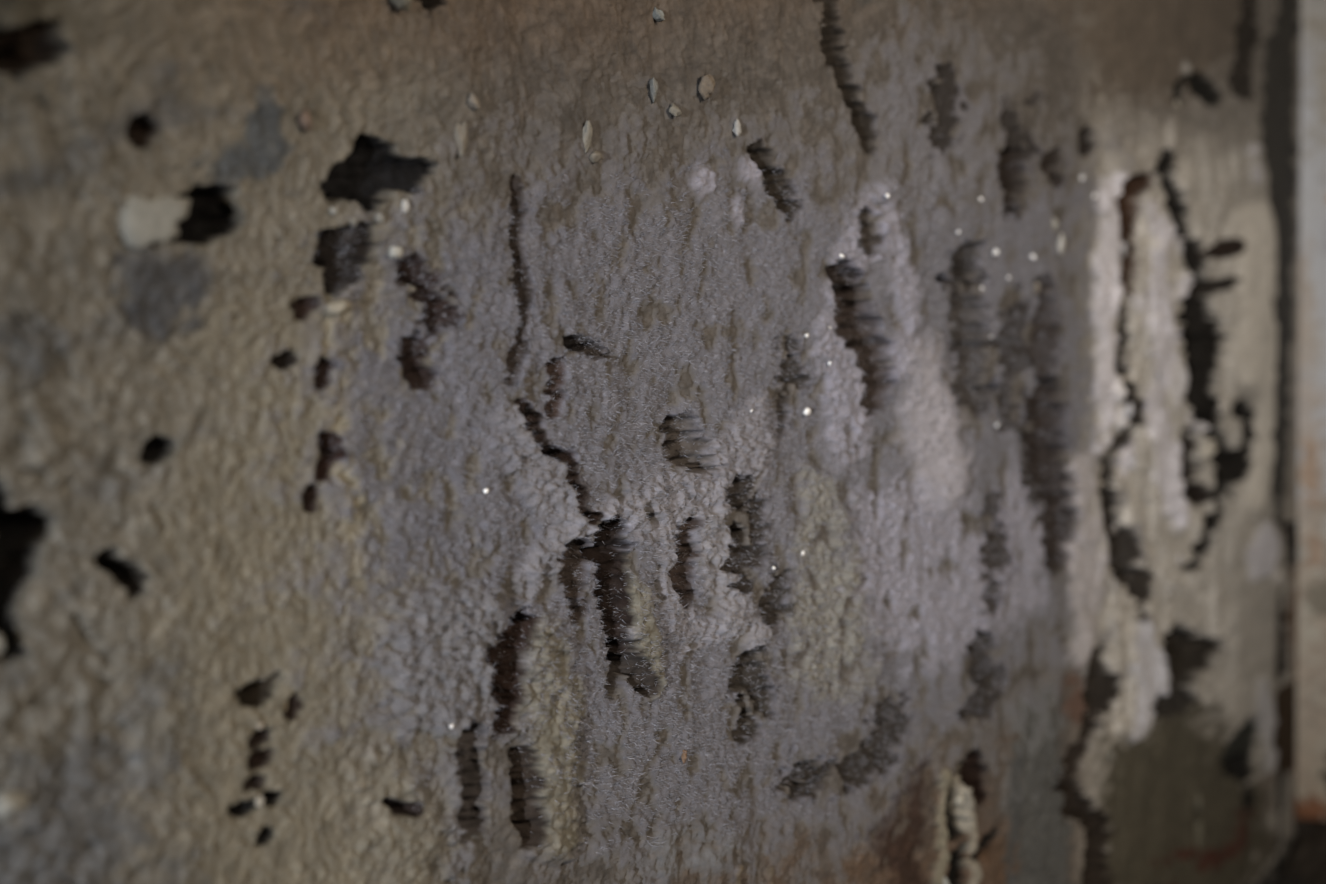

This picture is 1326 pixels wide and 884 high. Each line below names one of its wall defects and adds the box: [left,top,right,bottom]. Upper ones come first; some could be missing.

water stain [185,80,303,188]
crack [811,0,880,157]
peeling [1086,35,1301,585]
water stain [1297,572,1326,625]
flaking render [1125,617,1235,745]
water stain [445,748,532,884]
water stain [1087,687,1295,884]